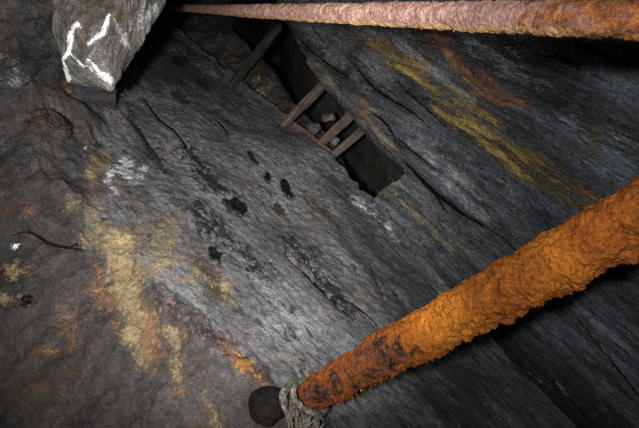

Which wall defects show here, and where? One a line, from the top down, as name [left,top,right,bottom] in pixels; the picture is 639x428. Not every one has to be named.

rust [162,0,639,112]
crack [135,124,166,172]
crack [143,97,188,149]
crack [12,231,86,251]
rust [188,252,244,313]
crack [282,252,378,327]
rust [297,176,639,411]
rust [220,329,265,386]